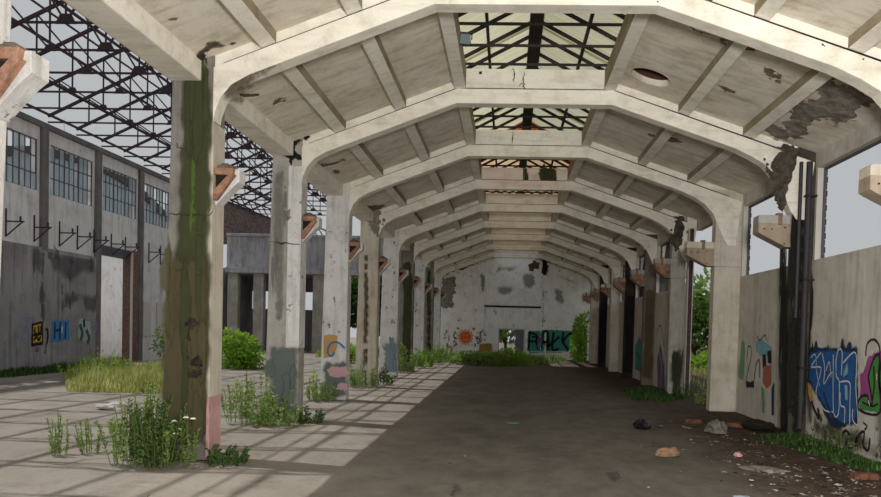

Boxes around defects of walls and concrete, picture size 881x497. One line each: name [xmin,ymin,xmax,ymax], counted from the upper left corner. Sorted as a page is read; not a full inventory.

leakage [184,41,236,166]
peeling [763,77,875,212]
leakage [33,247,96,320]
spalling [399,270,456,309]